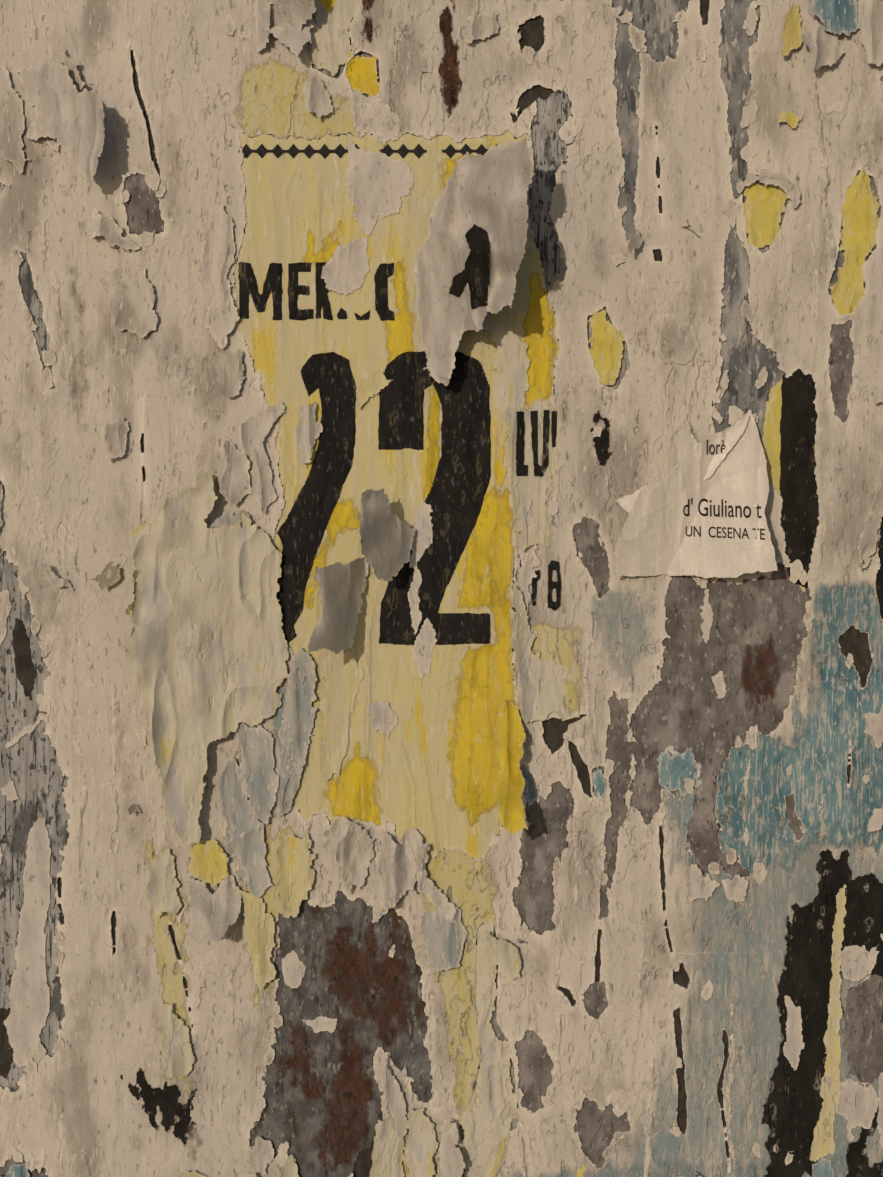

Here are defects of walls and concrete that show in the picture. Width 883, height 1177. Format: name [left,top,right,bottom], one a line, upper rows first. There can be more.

peeling [10,247,56,395]
peeling [0,46,105,182]
rust [438,0,462,115]
peeling [611,0,691,266]
peeling [711,0,801,447]
peeling [781,0,883,81]
peeling [572,517,610,599]
peeling [0,551,73,1090]
peeling [92,401,468,1177]
peeling [485,700,574,980]
peeling [594,559,814,919]
rust [285,923,409,1171]